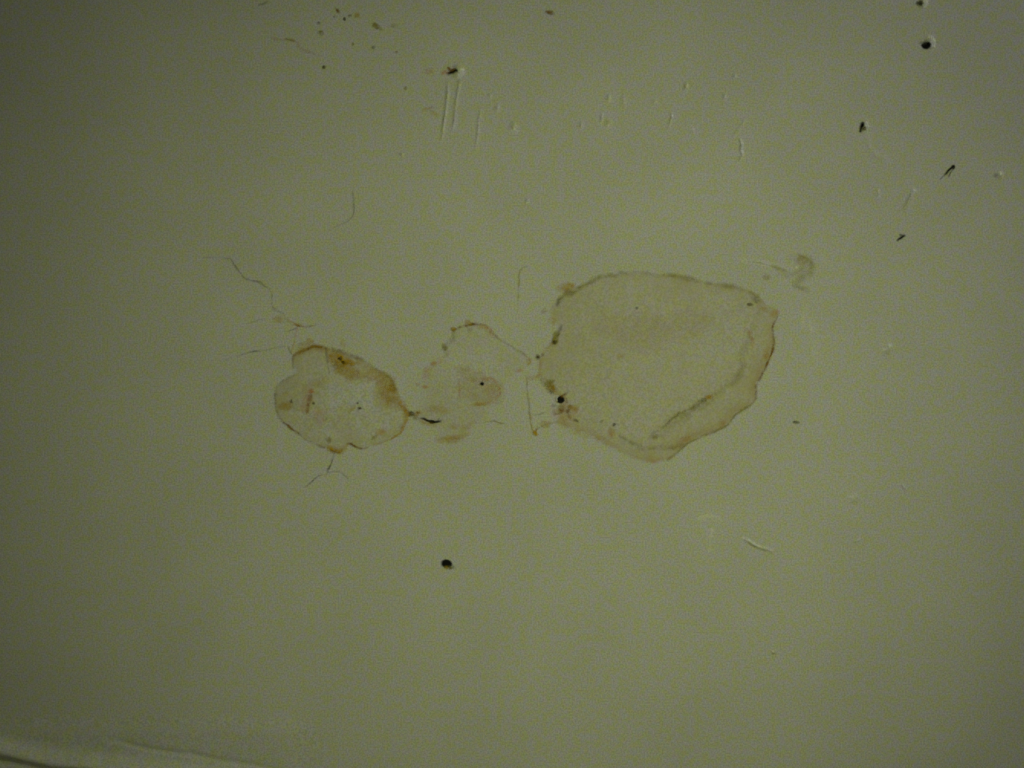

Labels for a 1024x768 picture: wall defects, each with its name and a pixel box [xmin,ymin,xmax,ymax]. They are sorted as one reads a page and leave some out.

water stain [275,271,779,463]